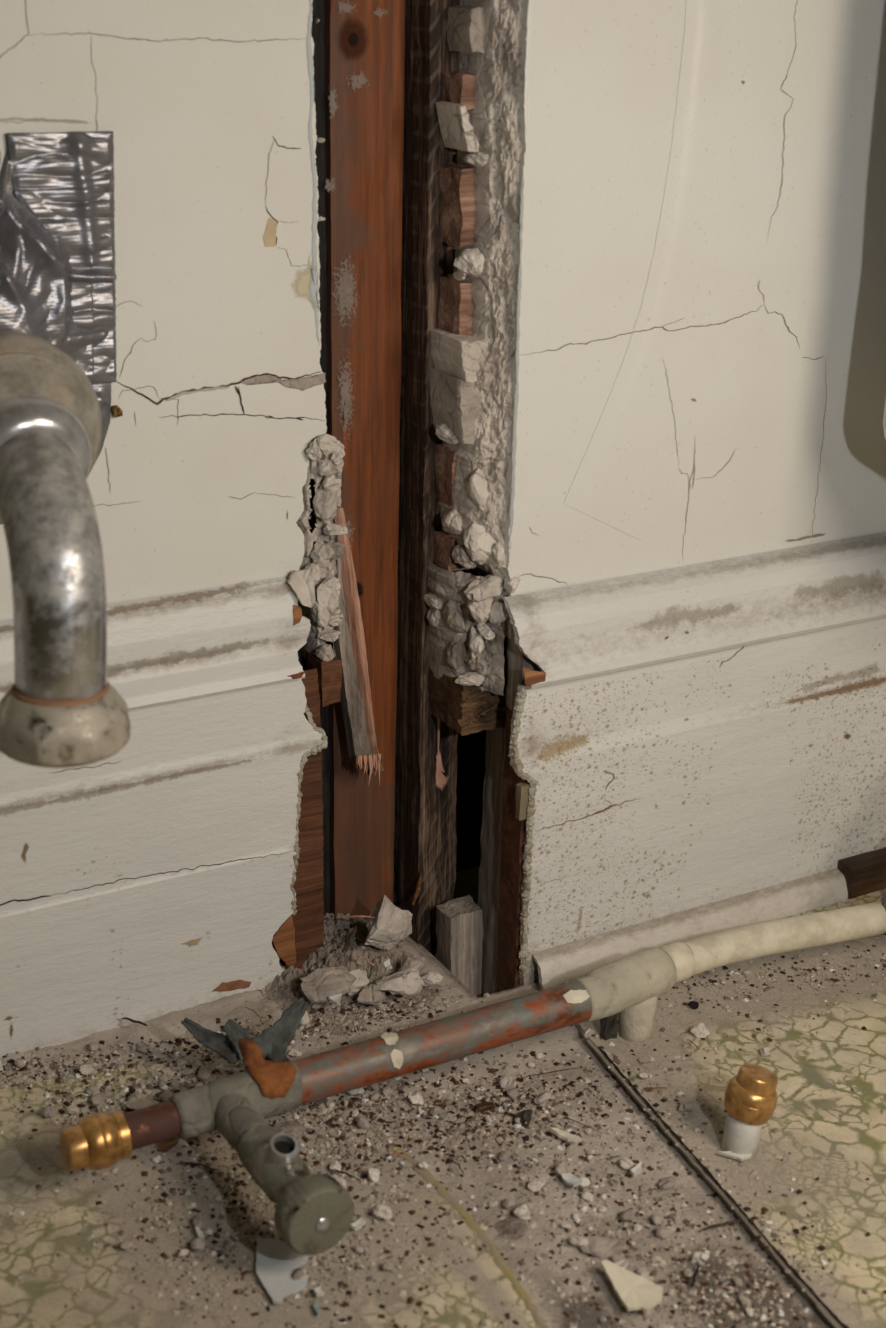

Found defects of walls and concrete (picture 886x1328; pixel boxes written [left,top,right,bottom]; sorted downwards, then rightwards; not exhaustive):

crack [0,0,304,130]
peeling [263,0,319,341]
crack [767,0,798,241]
crack [116,301,324,424]
spalling [427,0,531,696]
crack [519,279,827,560]
spalling [287,434,348,679]
crack [518,573,567,584]
spalling [524,667,546,686]
crack [0,852,289,906]
spalling [273,916,296,967]
peeling [328,993,342,1005]